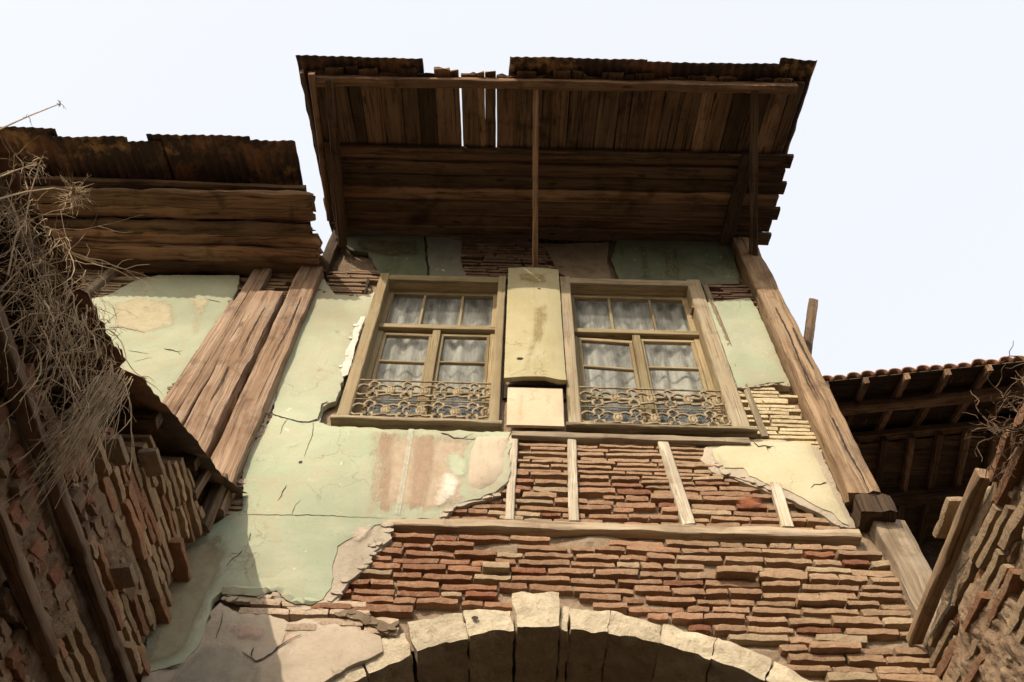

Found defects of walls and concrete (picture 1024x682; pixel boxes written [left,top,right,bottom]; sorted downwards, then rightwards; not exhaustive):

damp [115,298,172,332]
peeling [339,316,365,377]
spalling [737,383,791,391]
crack [269,401,328,456]
crack [226,486,347,567]
damp [374,429,474,512]
spalling [438,434,512,519]
spalling [712,453,840,527]
spalling [221,522,400,637]